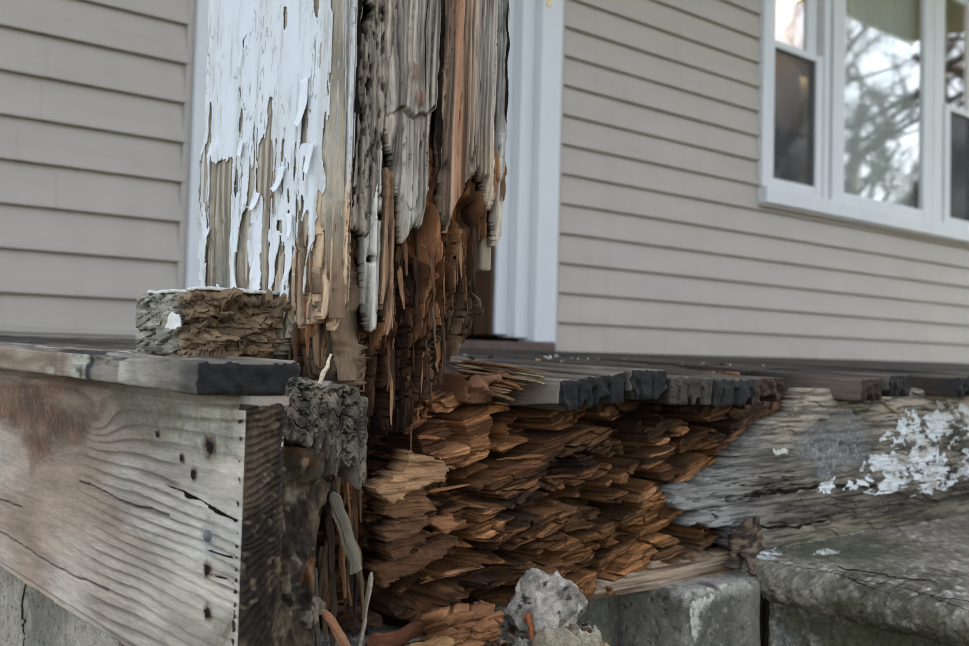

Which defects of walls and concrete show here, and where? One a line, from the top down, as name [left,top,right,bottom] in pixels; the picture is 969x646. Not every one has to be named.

peeling [147,0,333,317]
peeling [165,312,182,331]
peeling [799,400,969,497]
crack [19,585,27,646]